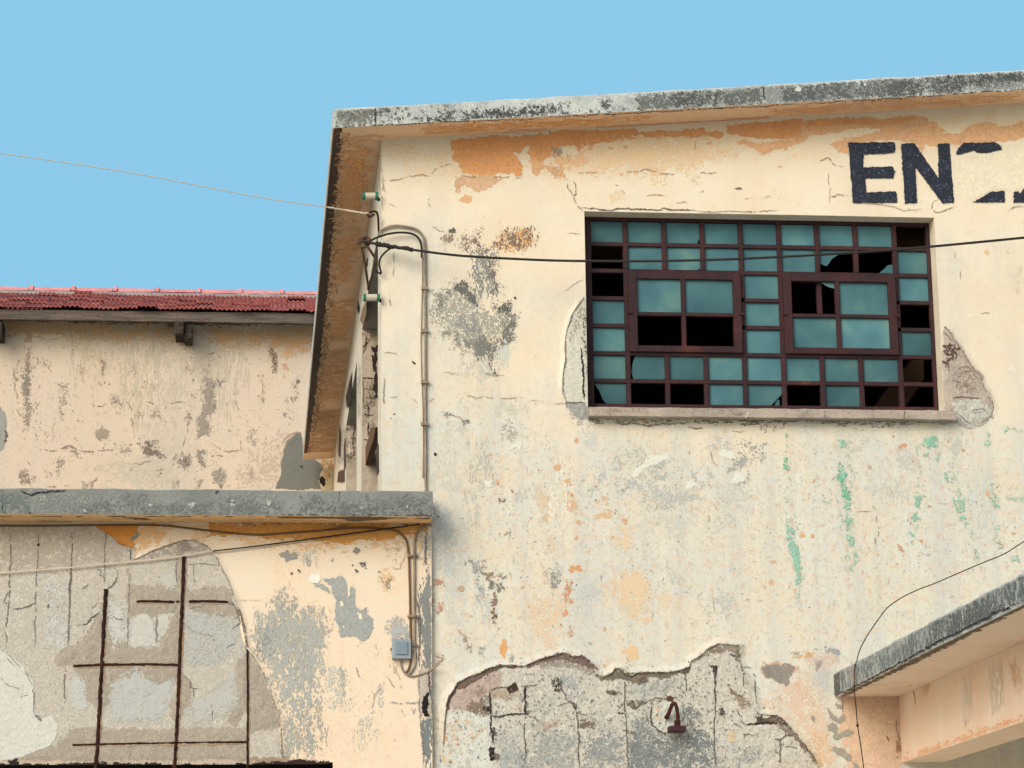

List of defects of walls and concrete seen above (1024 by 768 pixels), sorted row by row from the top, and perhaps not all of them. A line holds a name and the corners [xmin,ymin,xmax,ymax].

peeling [450,115,1024,203]
peeling [438,225,540,256]
peeling [265,324,313,371]
spalling [561,297,588,420]
spalling [942,326,994,429]
crack [0,480,96,720]
rust [77,561,250,759]
crack [63,528,282,758]
spalling [0,522,428,768]
peeling [419,564,903,768]
crack [618,651,817,768]